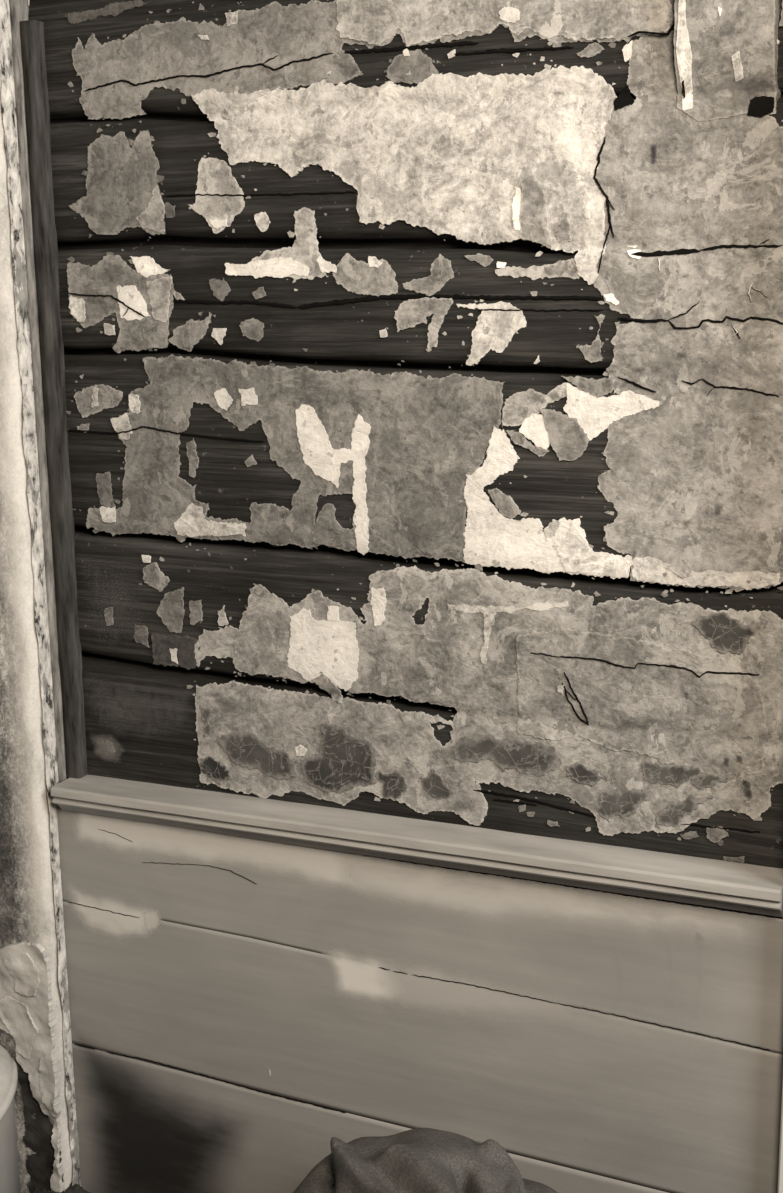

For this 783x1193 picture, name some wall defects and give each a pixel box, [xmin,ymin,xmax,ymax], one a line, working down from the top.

crack [86,53,334,91]
peeling [336,0,693,110]
peeling [104,256,185,335]
peeling [209,253,454,301]
crack [619,301,783,338]
crack [619,377,656,392]
crack [682,378,779,397]
peeling [502,376,660,461]
peeling [296,404,371,555]
peeling [543,519,628,578]
peeling [287,605,359,704]
crack [531,652,760,678]